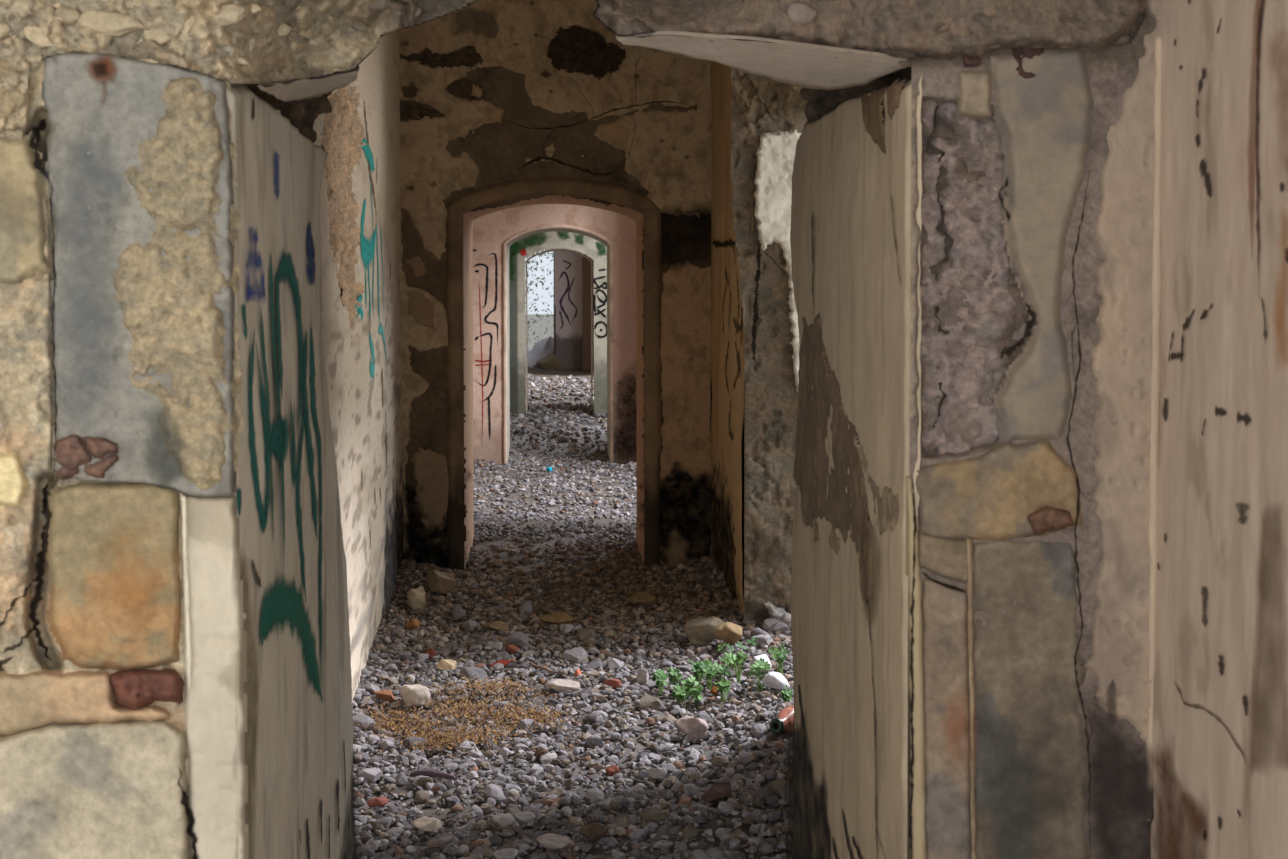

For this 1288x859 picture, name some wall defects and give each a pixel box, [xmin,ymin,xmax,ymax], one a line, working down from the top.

corrosion [90,57,115,93]
crack [510,48,700,176]
peeling [861,81,904,154]
spalling [1195,134,1211,198]
crack [0,119,57,666]
spalling [0,0,698,490]
peeling [394,345,466,540]
peeling [793,313,900,604]
spalling [920,100,1028,455]
spalling [1168,304,1213,362]
spalling [1201,407,1251,435]
damp [639,462,737,602]